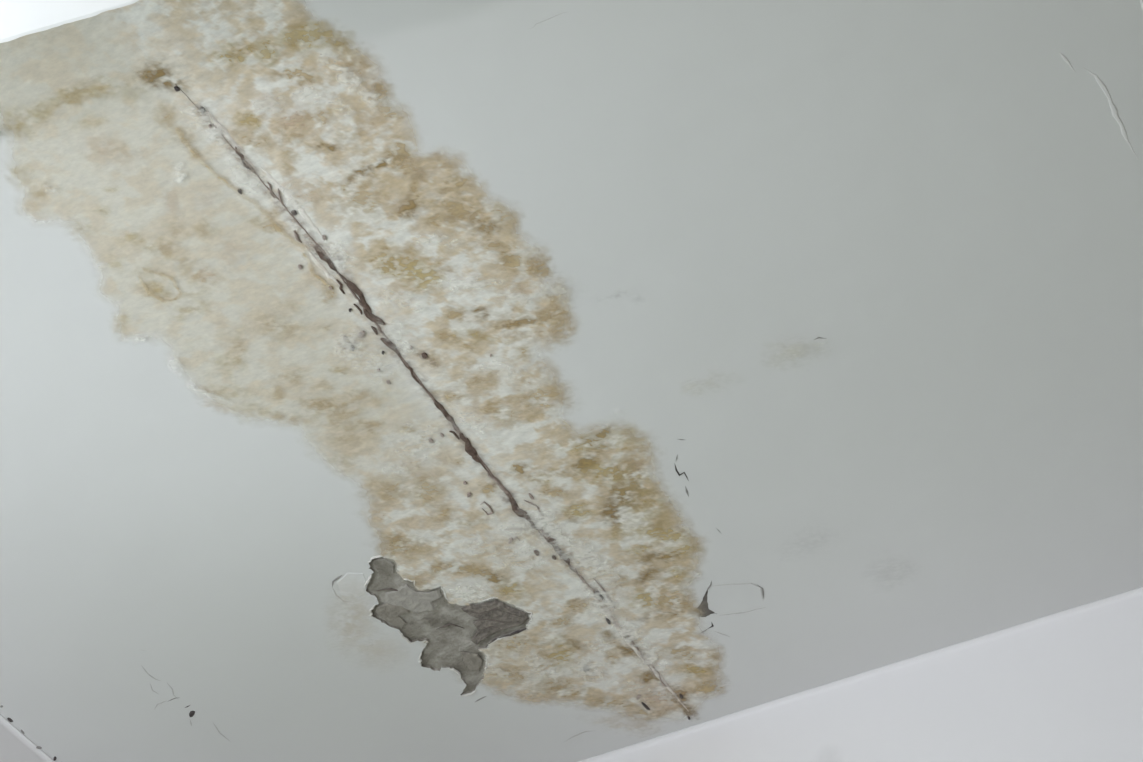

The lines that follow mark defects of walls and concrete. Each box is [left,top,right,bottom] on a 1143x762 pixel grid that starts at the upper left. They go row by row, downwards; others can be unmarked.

water stain [0,0,718,719]
spalling [332,555,533,697]
crack [174,84,693,720]